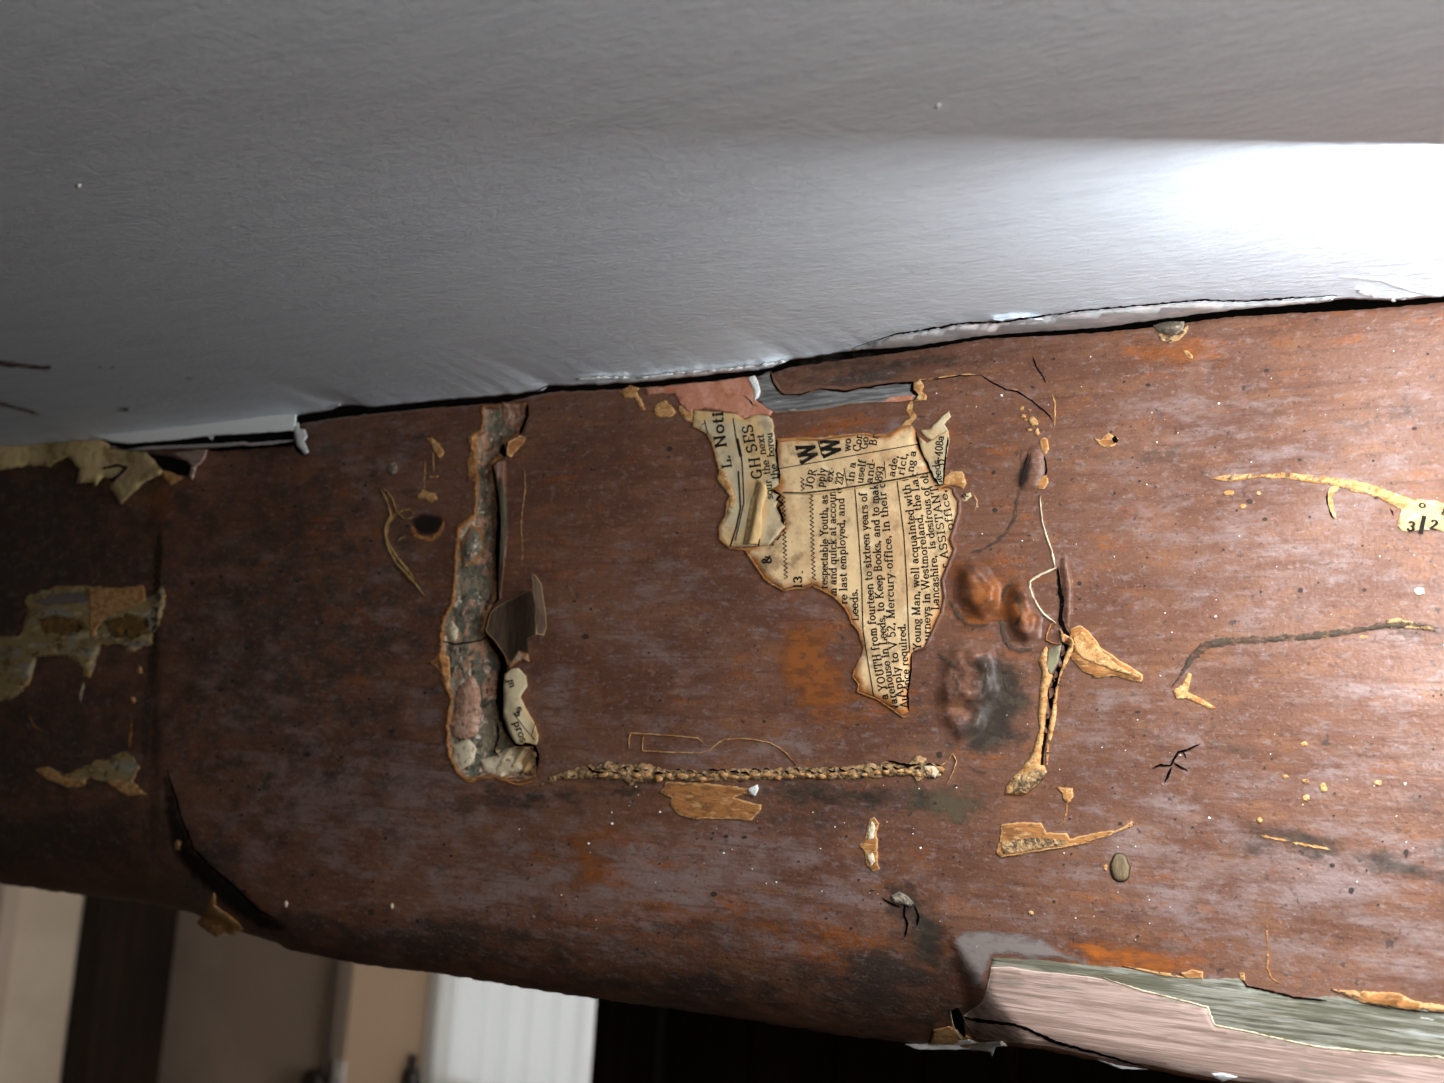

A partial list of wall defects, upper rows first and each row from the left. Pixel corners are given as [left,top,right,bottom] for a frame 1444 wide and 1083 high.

peeling [39,585,151,639]
rust [779,627,846,706]
peeling [914,485,962,652]
rust [952,561,1035,625]
spalling [1070,581,1143,682]
crack [1172,622,1427,687]
peeling [35,751,148,796]
peeling [593,724,946,845]
crack [166,770,284,930]
peeling [989,784,1133,866]
rust [1075,943,1193,971]
spalling [905,1008,1007,1052]